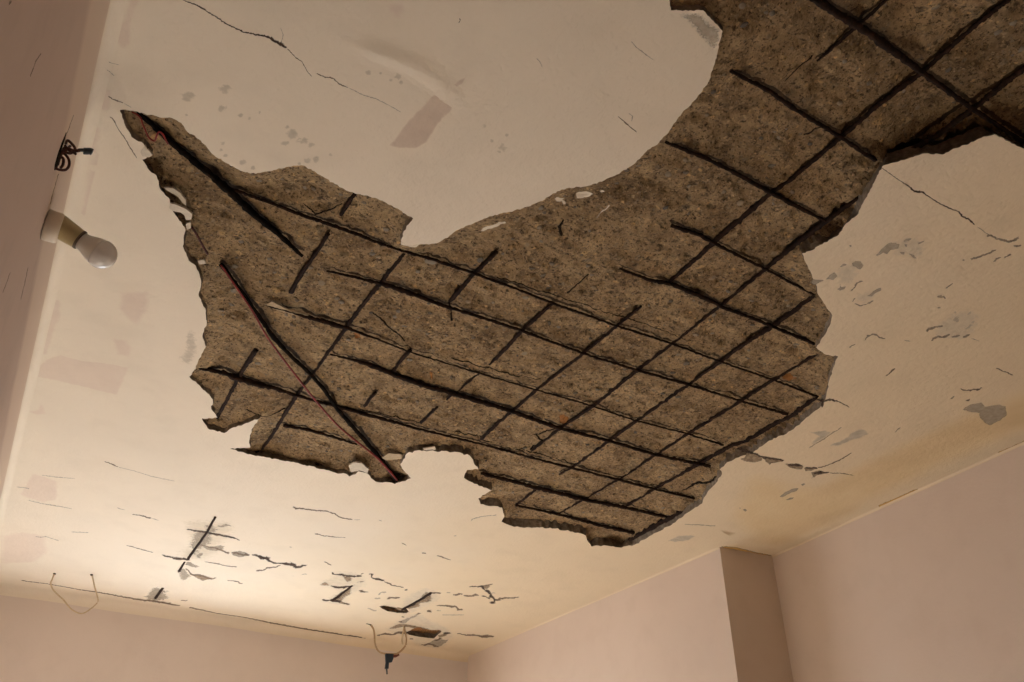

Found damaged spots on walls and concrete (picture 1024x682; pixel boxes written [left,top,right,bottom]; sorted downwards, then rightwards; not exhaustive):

crack [184,0,348,88]
crack [881,167,975,225]
spalling [124,0,1024,543]
flaking render [127,516,242,584]
crack [293,507,352,538]
flaking render [147,588,168,600]
flaking render [315,562,370,607]
flaking render [377,584,518,649]